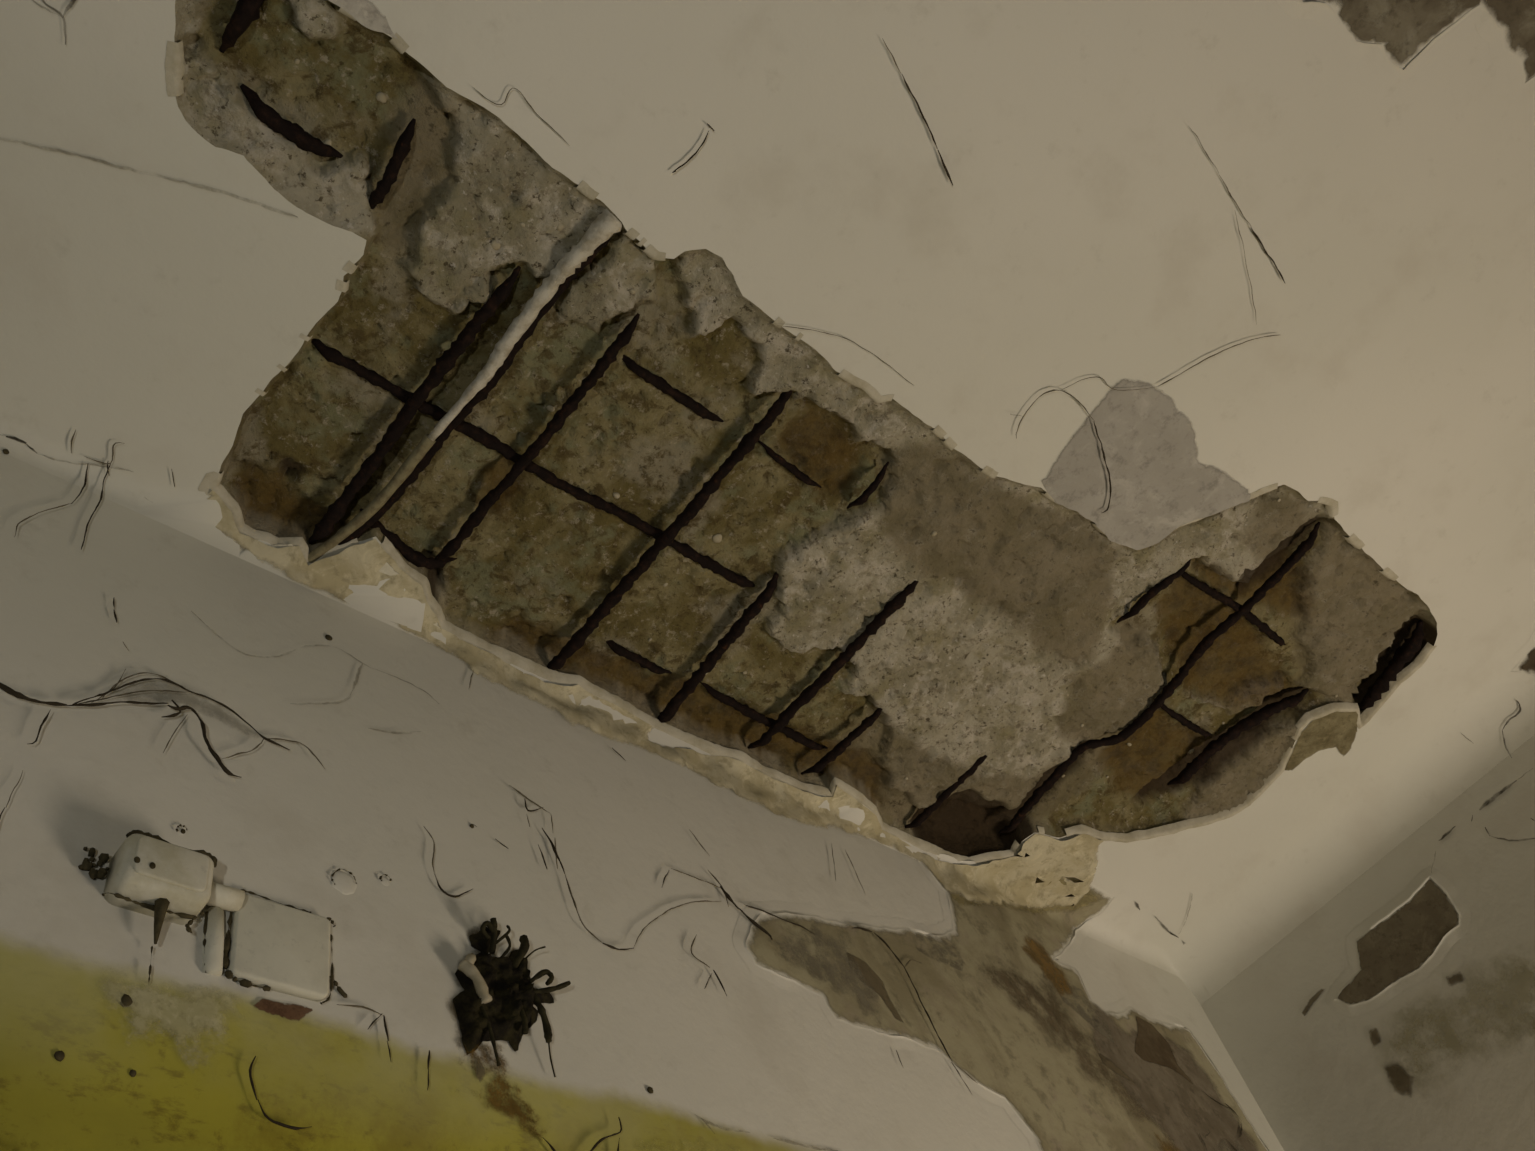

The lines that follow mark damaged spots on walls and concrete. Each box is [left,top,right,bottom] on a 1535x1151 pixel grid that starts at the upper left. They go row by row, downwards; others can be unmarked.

crack [41,0,76,45]
peeling [1275,0,1535,99]
crack [35,146,123,169]
spalling [165,0,1437,865]
peeling [208,490,1273,1151]
peeling [1302,866,1471,1017]
peeling [105,981,233,1064]